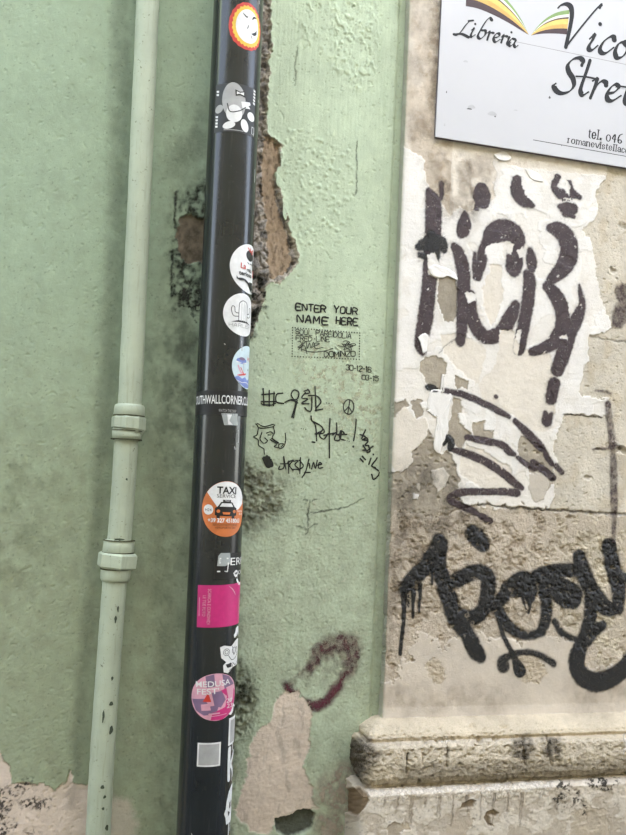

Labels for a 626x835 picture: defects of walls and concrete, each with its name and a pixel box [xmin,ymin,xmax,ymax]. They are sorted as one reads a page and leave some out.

flaking render [250,0,300,337]
spalling [380,0,626,687]
peeling [234,657,370,835]
peeling [0,751,88,835]
peeling [100,783,144,835]
flaking render [386,821,411,835]
peeling [566,806,612,835]